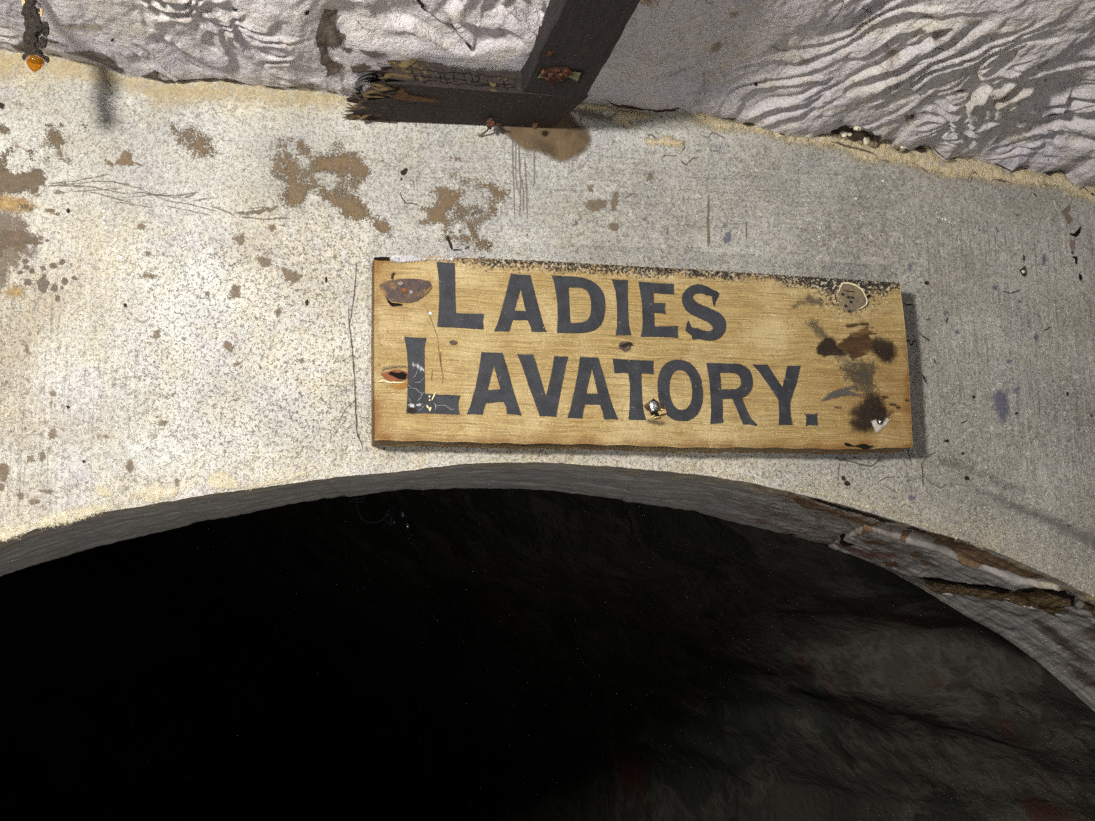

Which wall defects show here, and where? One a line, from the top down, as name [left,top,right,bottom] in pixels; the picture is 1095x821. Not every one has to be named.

corrosion [21,0,50,73]
damp [0,212,77,301]
flaking render [787,493,1095,623]